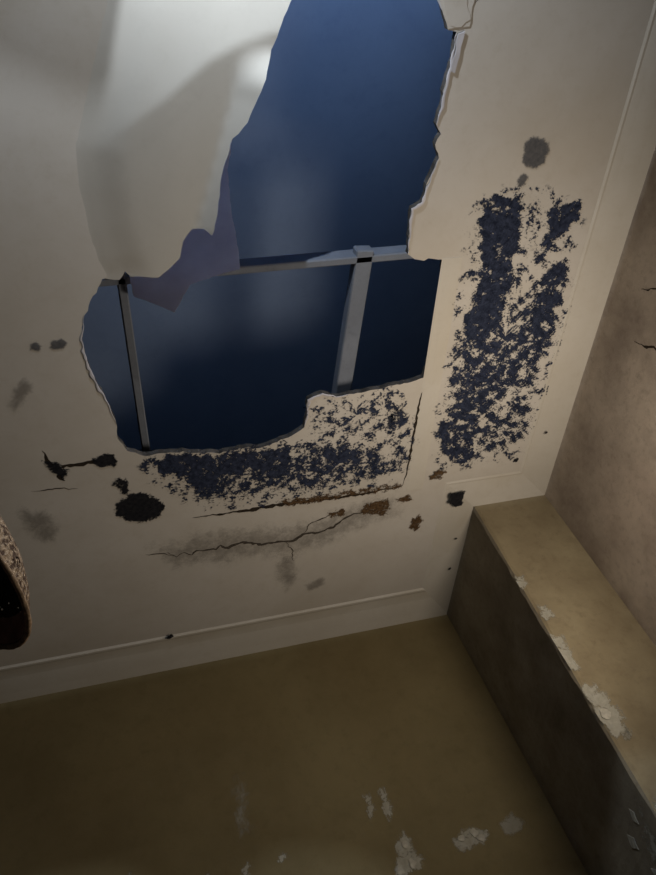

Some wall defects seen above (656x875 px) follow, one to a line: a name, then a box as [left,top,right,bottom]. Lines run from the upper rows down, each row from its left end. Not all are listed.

peeling [440,0,477,73]
damp [431,138,584,470]
damp [112,478,165,523]
damp [139,388,416,512]
crack [150,393,422,560]
flaking render [550,634,580,671]
flaking render [582,684,632,739]
peeling [362,788,392,822]
peeling [394,831,423,875]
peeling [452,828,489,852]